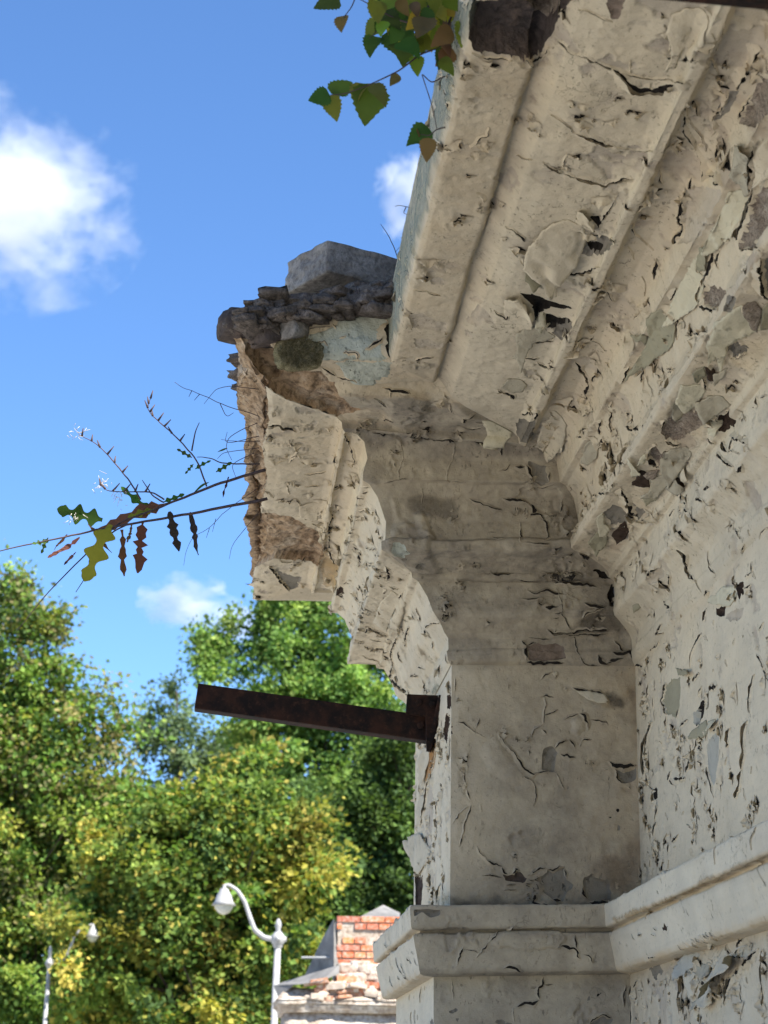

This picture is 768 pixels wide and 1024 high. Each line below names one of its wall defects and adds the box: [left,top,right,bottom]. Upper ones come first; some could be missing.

spalling [425,0,572,161]
spalling [706,56,768,128]
peeling [479,137,768,631]
spalling [234,317,430,696]
crack [263,319,768,695]
crack [420,748,562,905]
crack [457,694,608,806]
crack [482,548,768,919]
peeling [584,633,737,880]
crack [456,946,464,966]
crack [557,935,594,964]
peeling [629,938,767,1024]